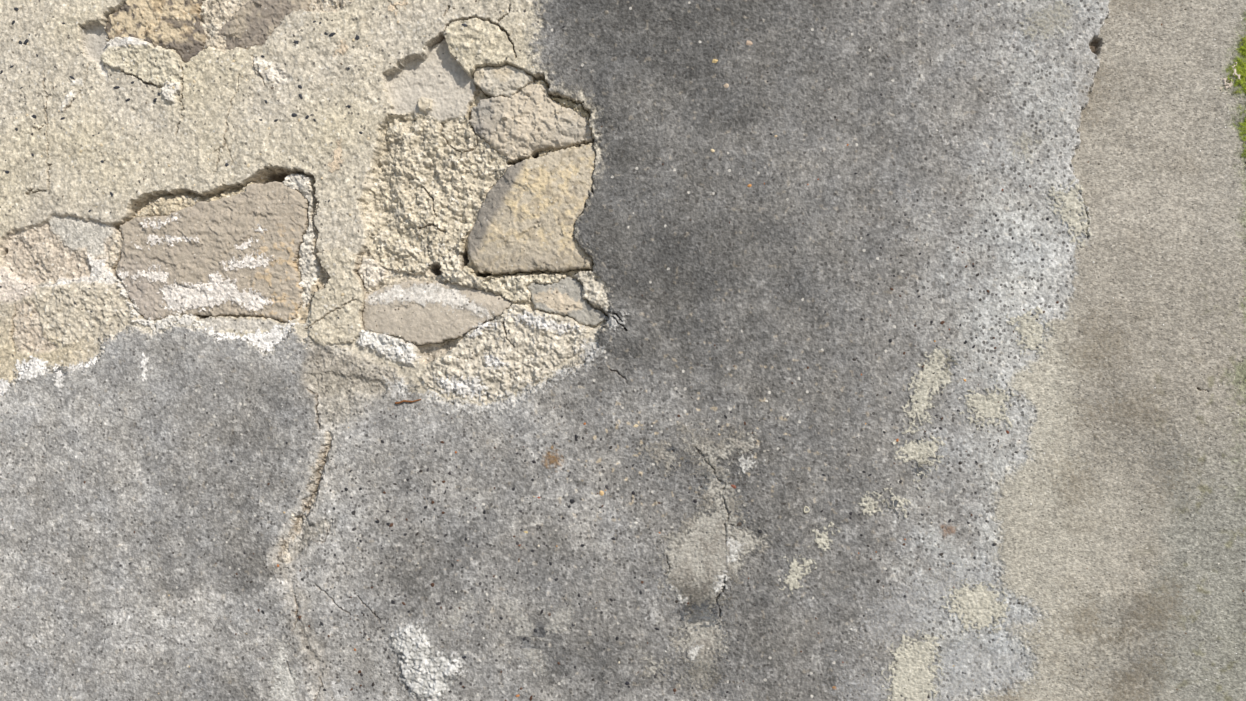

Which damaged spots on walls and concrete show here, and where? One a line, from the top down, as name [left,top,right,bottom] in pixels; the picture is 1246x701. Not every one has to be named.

spalling [199,0,251,53]
spalling [305,0,355,13]
crack [427,0,517,59]
crack [124,64,185,135]
crack [419,187,442,233]
spalling [354,38,609,365]
spalling [0,168,330,324]
crack [256,204,367,330]
water stain [605,309,627,330]
water stain [738,455,766,474]
water stain [713,538,744,596]
water stain [504,601,574,671]